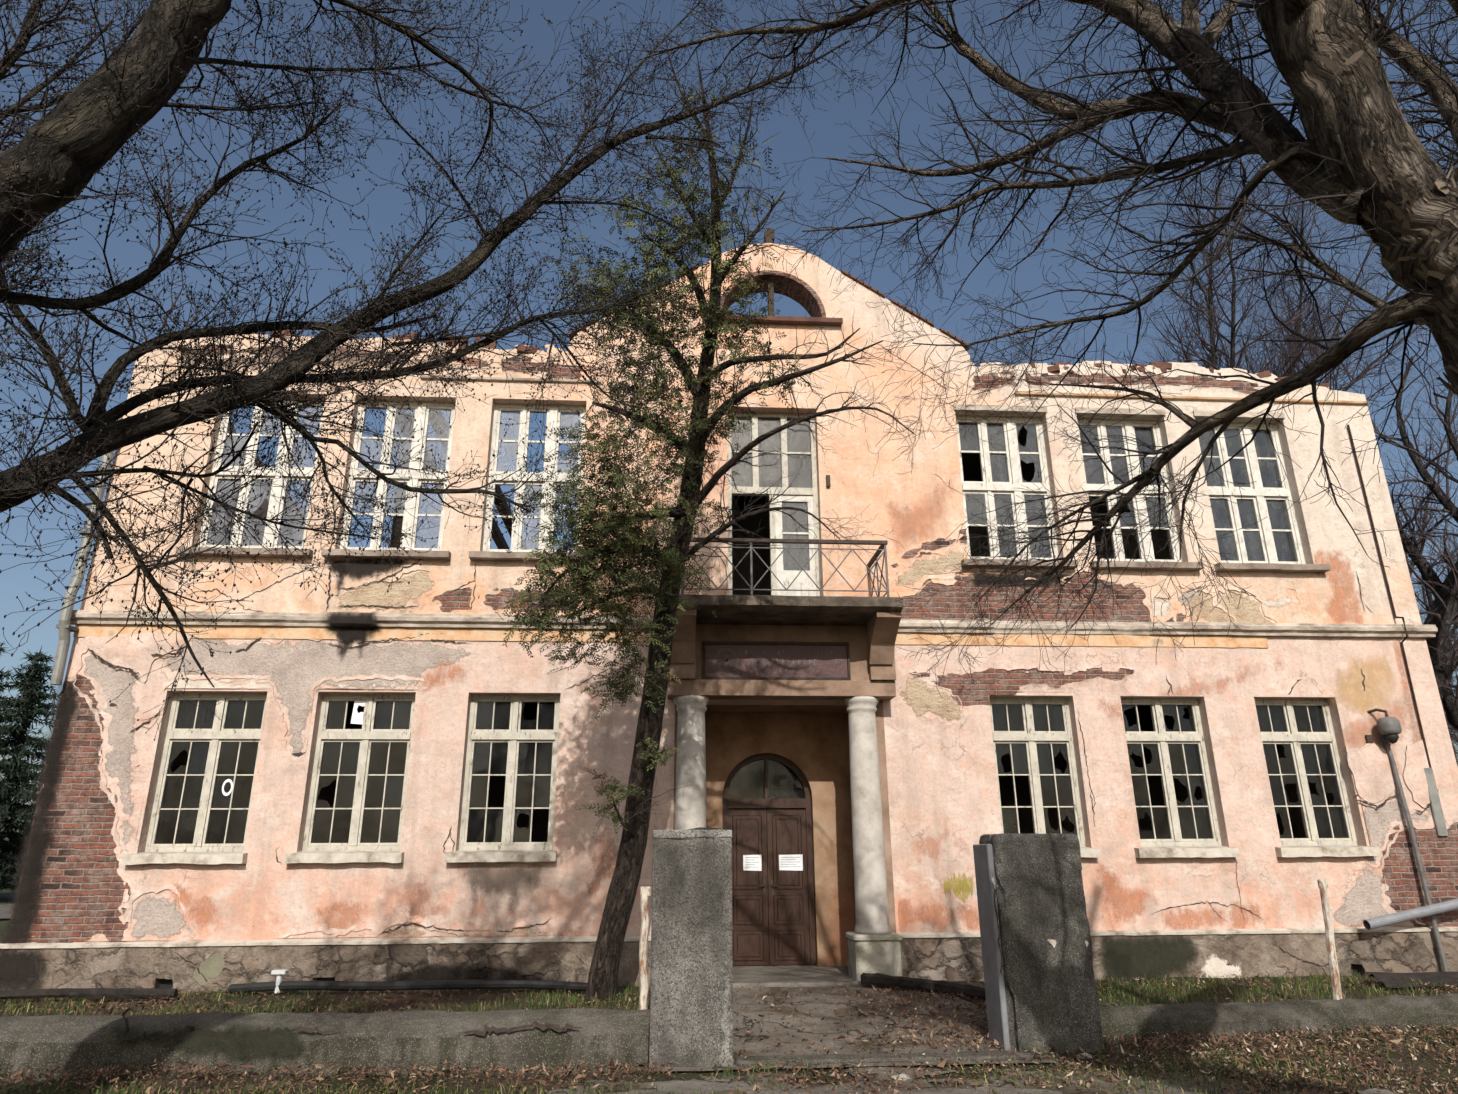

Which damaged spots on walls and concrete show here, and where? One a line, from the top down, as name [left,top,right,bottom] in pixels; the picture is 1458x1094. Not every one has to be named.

spalling [958,360,1278,404]
damp [330,558,406,591]
peeling [322,559,590,615]
peeling [1315,552,1360,624]
damp [324,612,379,655]
spalling [876,517,1309,735]
spalling [10,638,486,992]
spalling [1320,787,1458,927]